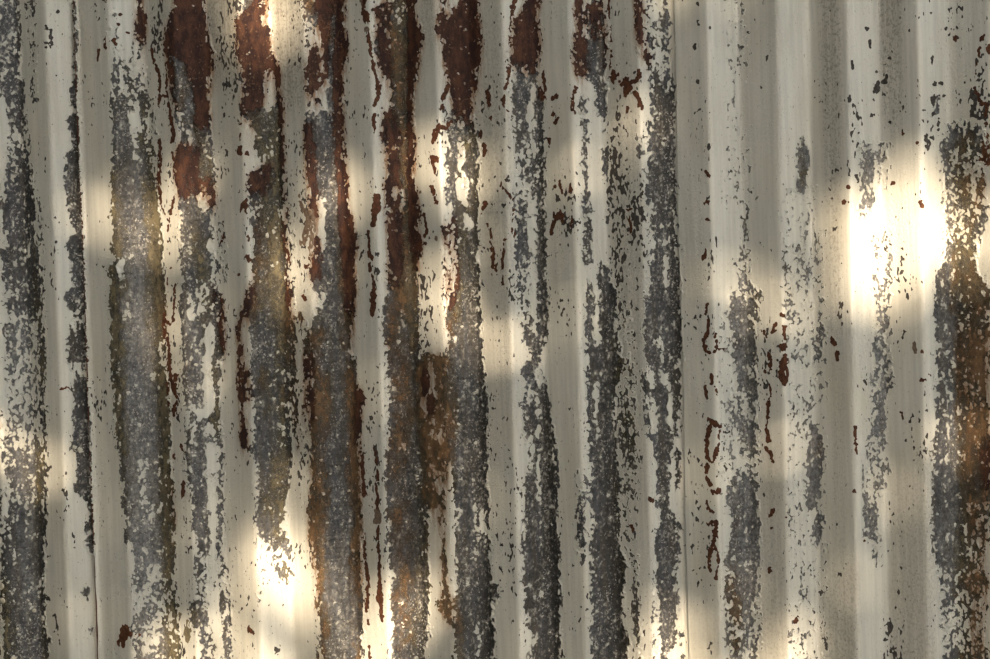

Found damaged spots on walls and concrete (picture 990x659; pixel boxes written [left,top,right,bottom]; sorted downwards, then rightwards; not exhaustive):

corrosion [360,0,370,32]
corrosion [508,0,518,47]
corrosion [978,133,990,167]
corrosion [367,193,381,318]
corrosion [761,312,789,386]